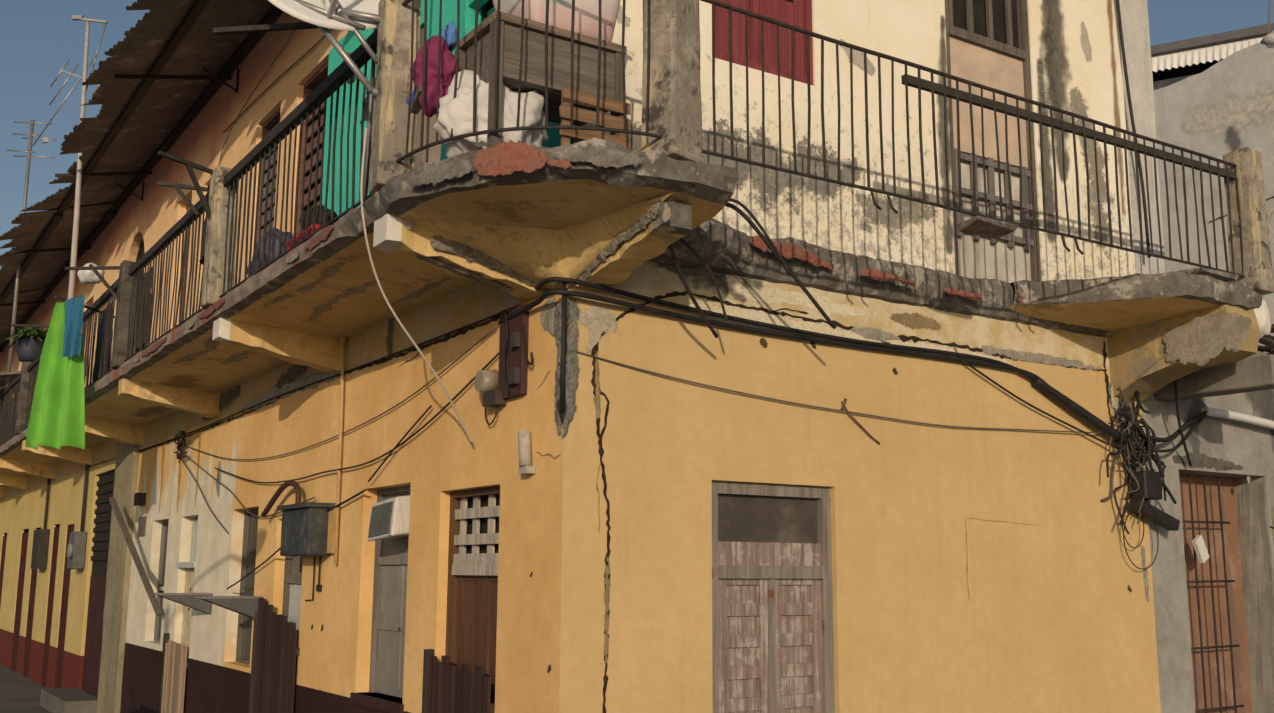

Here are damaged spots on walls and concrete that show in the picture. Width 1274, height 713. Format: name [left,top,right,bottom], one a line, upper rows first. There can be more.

flaking render [410,140,645,188]
leakage [1037,0,1114,260]
spalling [391,235,537,305]
spalling [540,295,618,438]
spalling [579,207,671,281]
peeling [668,198,1016,367]
peeling [1162,309,1252,366]
crack [591,291,1117,713]